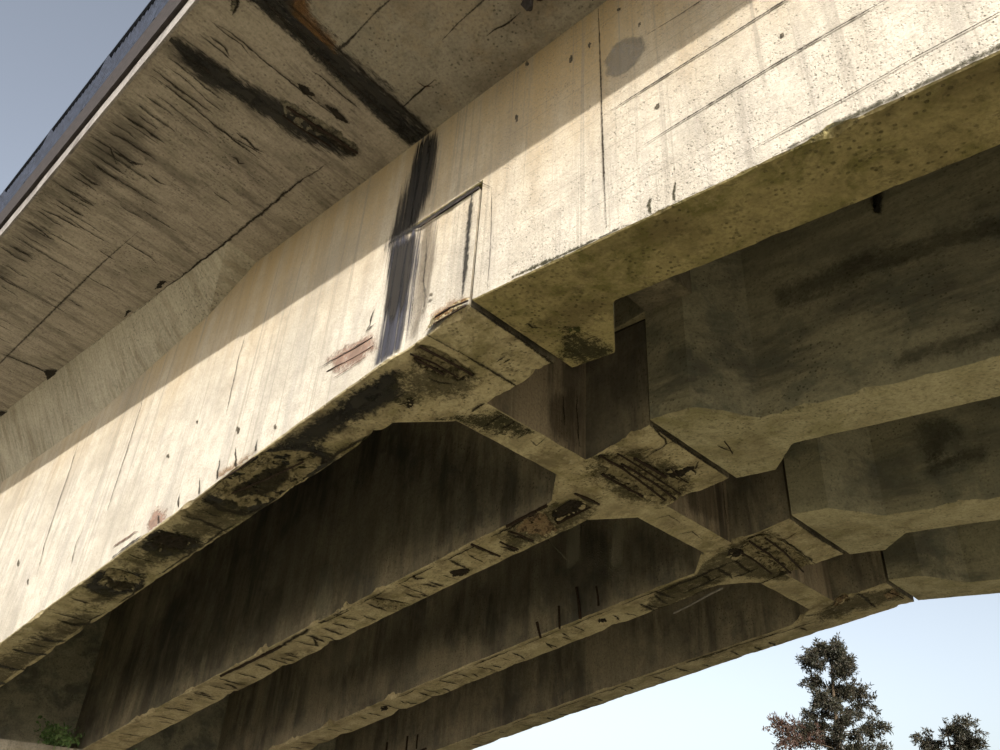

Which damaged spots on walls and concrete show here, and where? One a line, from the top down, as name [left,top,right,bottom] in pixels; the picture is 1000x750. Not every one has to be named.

leakage [119,0,482,580]
spalling [410,343,475,384]
spalling [426,297,470,330]
leakage [556,326,613,365]
leakage [435,410,534,439]
spalling [198,439,335,517]
spalling [598,453,699,505]
spalling [0,507,205,685]
spalling [121,493,600,737]
spalling [598,532,815,623]